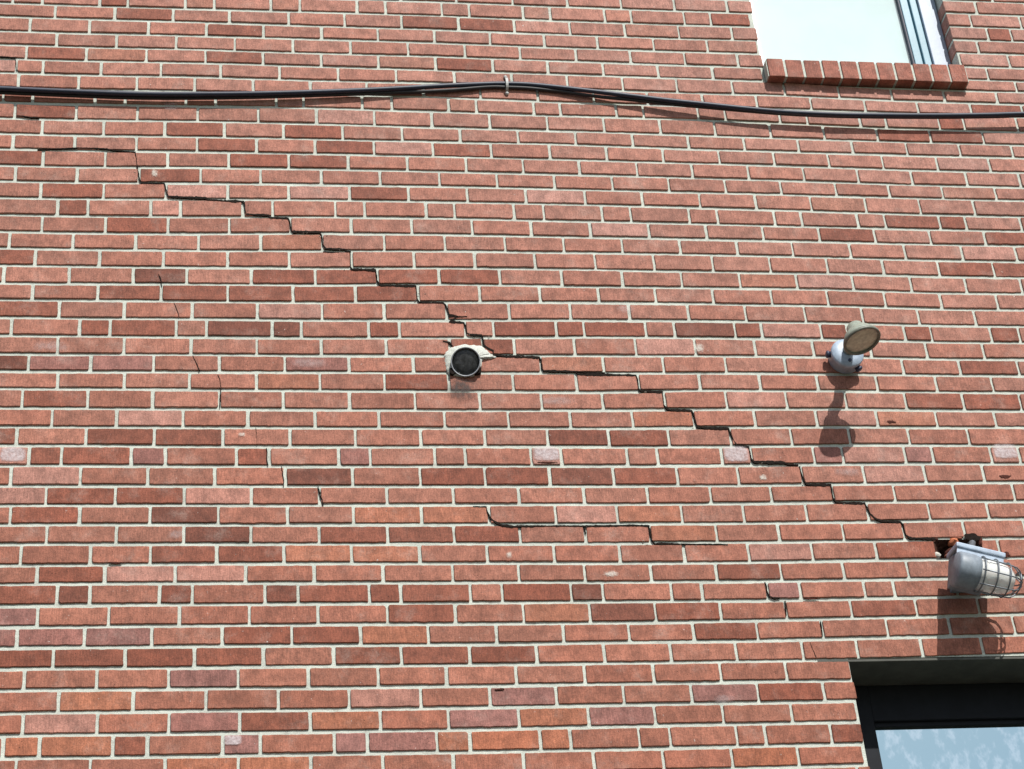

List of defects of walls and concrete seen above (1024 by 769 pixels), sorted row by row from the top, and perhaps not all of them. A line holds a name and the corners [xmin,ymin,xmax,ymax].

crack [37,147,937,546]